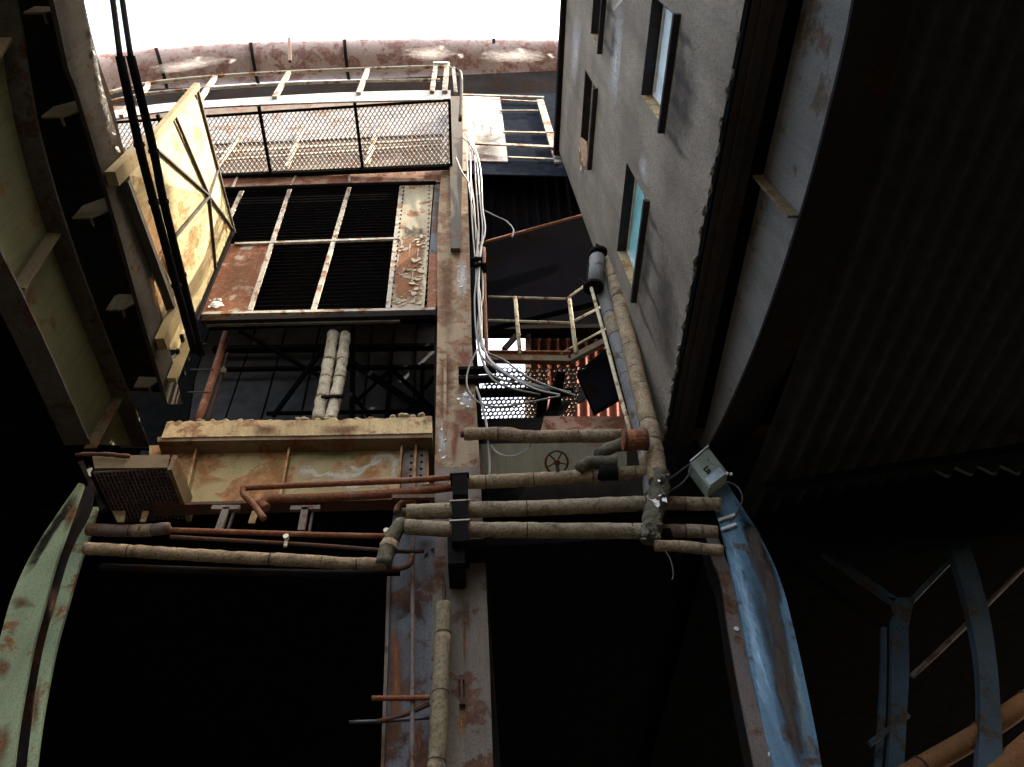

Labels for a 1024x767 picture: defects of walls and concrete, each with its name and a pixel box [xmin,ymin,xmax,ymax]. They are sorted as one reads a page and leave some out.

peeling [391,233,426,308]
corrosion [443,267,451,322]
corrosion [746,528,799,753]